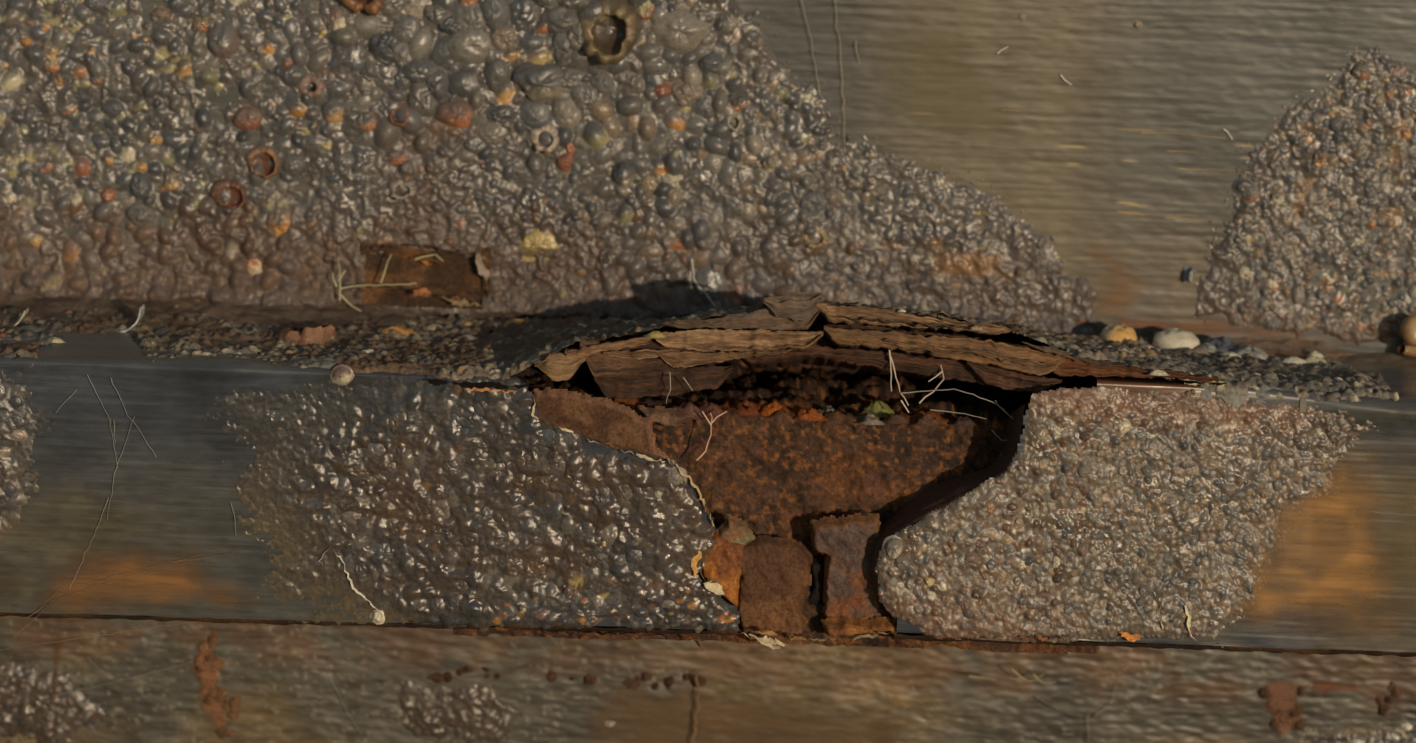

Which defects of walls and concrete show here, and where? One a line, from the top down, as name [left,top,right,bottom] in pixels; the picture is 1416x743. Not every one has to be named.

spalling [411,360,1099,654]
rust [1246,473,1380,619]
rust [191,631,242,740]
peeling [1118,631,1147,642]
rust [1257,681,1359,734]
rust [1376,681,1403,716]